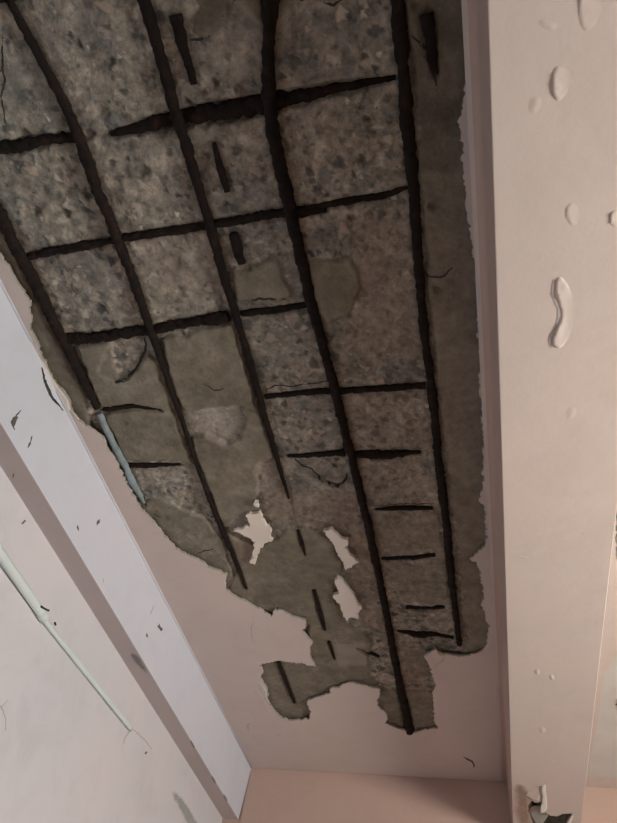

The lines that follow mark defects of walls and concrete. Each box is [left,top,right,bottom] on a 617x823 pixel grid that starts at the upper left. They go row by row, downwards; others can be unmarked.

spalling [0,0,490,733]
spalling [525,784,573,823]